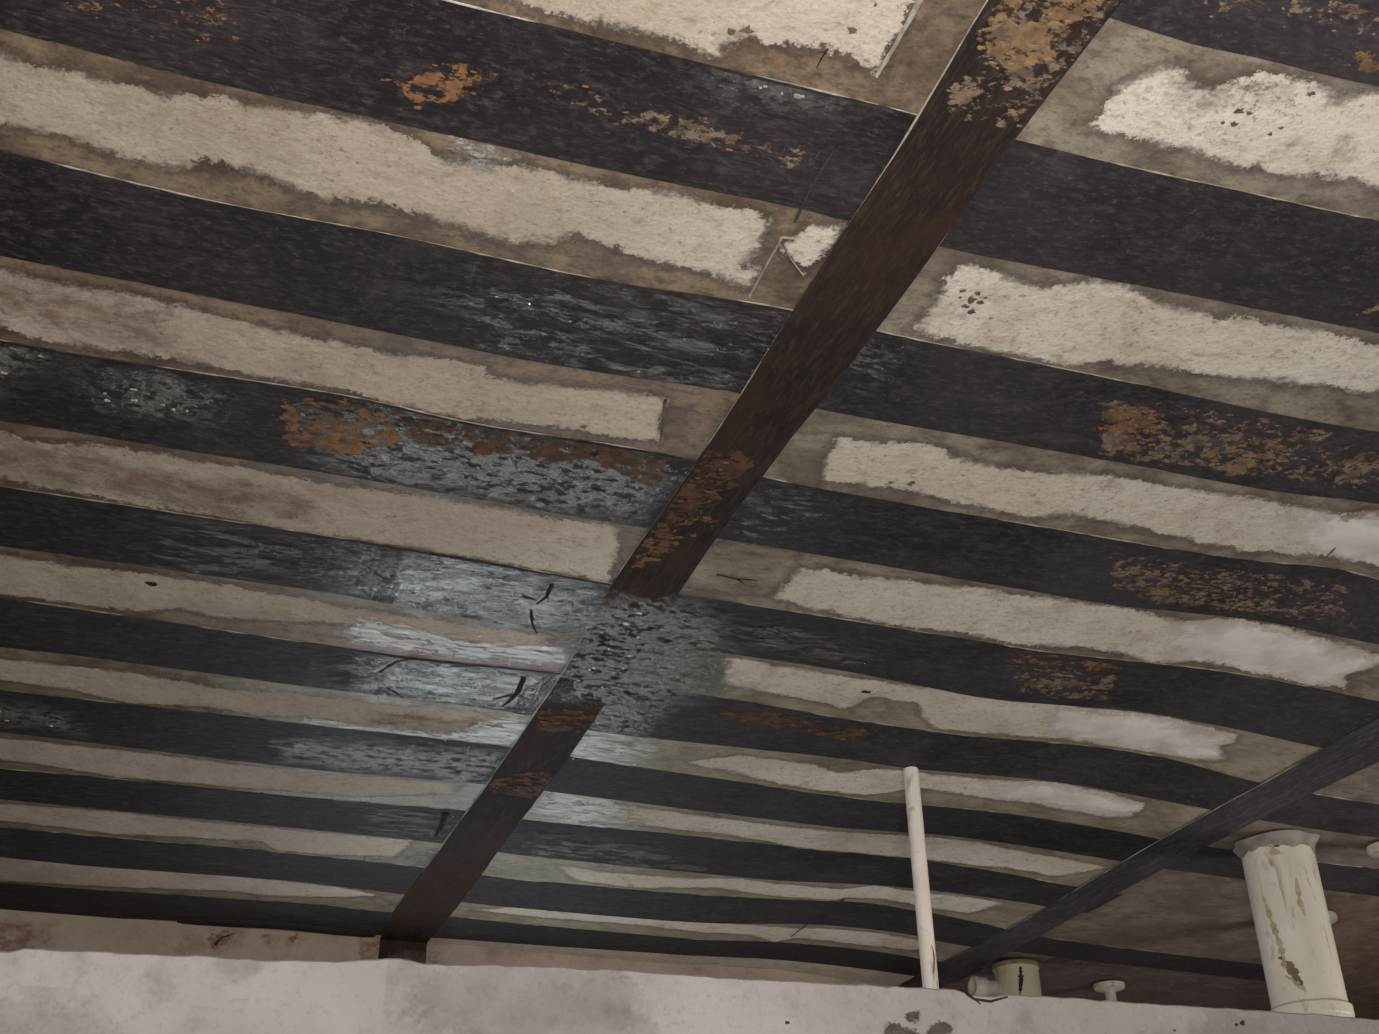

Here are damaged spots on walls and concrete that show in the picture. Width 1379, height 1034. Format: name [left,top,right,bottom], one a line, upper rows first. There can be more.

rust [380,62,497,110]
rust [946,0,1117,129]
rust [1204,0,1379,78]
water stain [0,29,849,583]
water stain [849,246,1379,432]
rust [276,397,664,490]
rust [1095,398,1379,488]
rust [627,444,755,571]
rust [1107,551,1356,629]
water stain [0,408,1379,869]
rust [1004,651,1123,700]
flaking render [884,1011,952,1034]